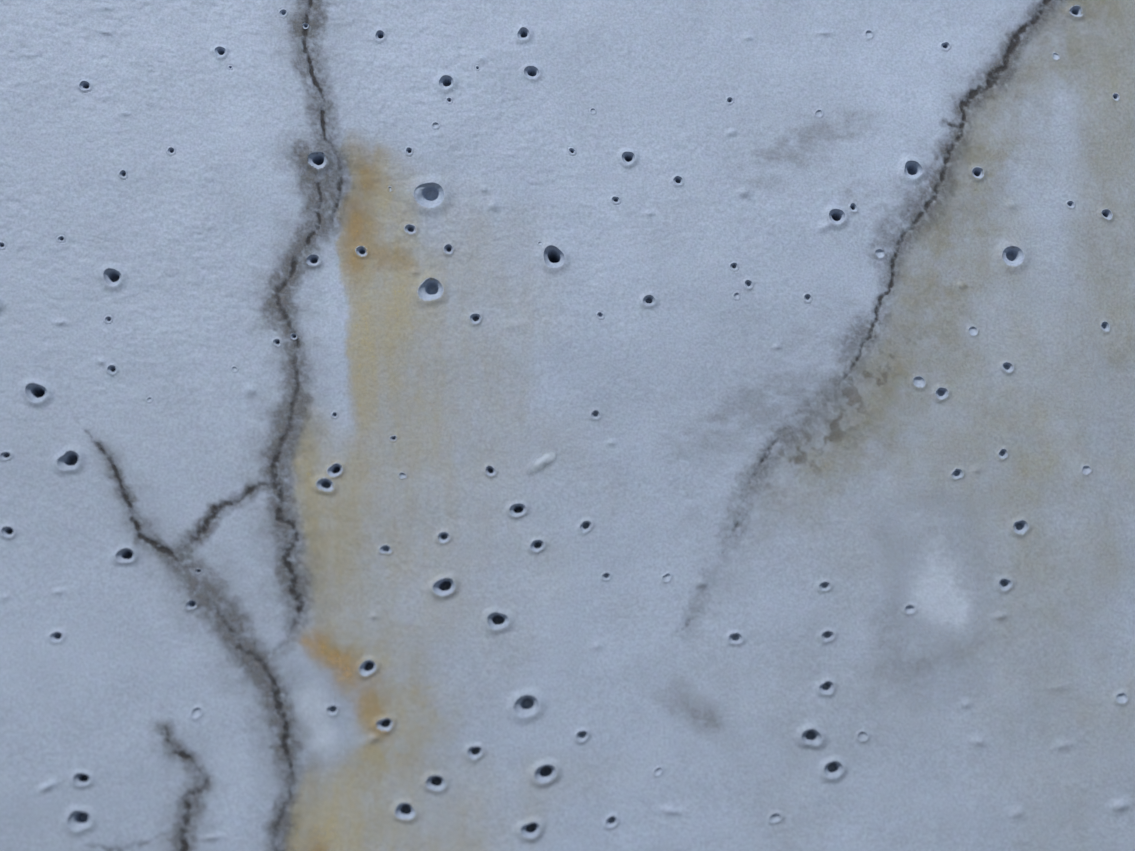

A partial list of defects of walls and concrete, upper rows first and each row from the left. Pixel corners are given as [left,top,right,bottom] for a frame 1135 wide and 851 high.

crack [98,0,346,851]
crack [852,0,1055,367]